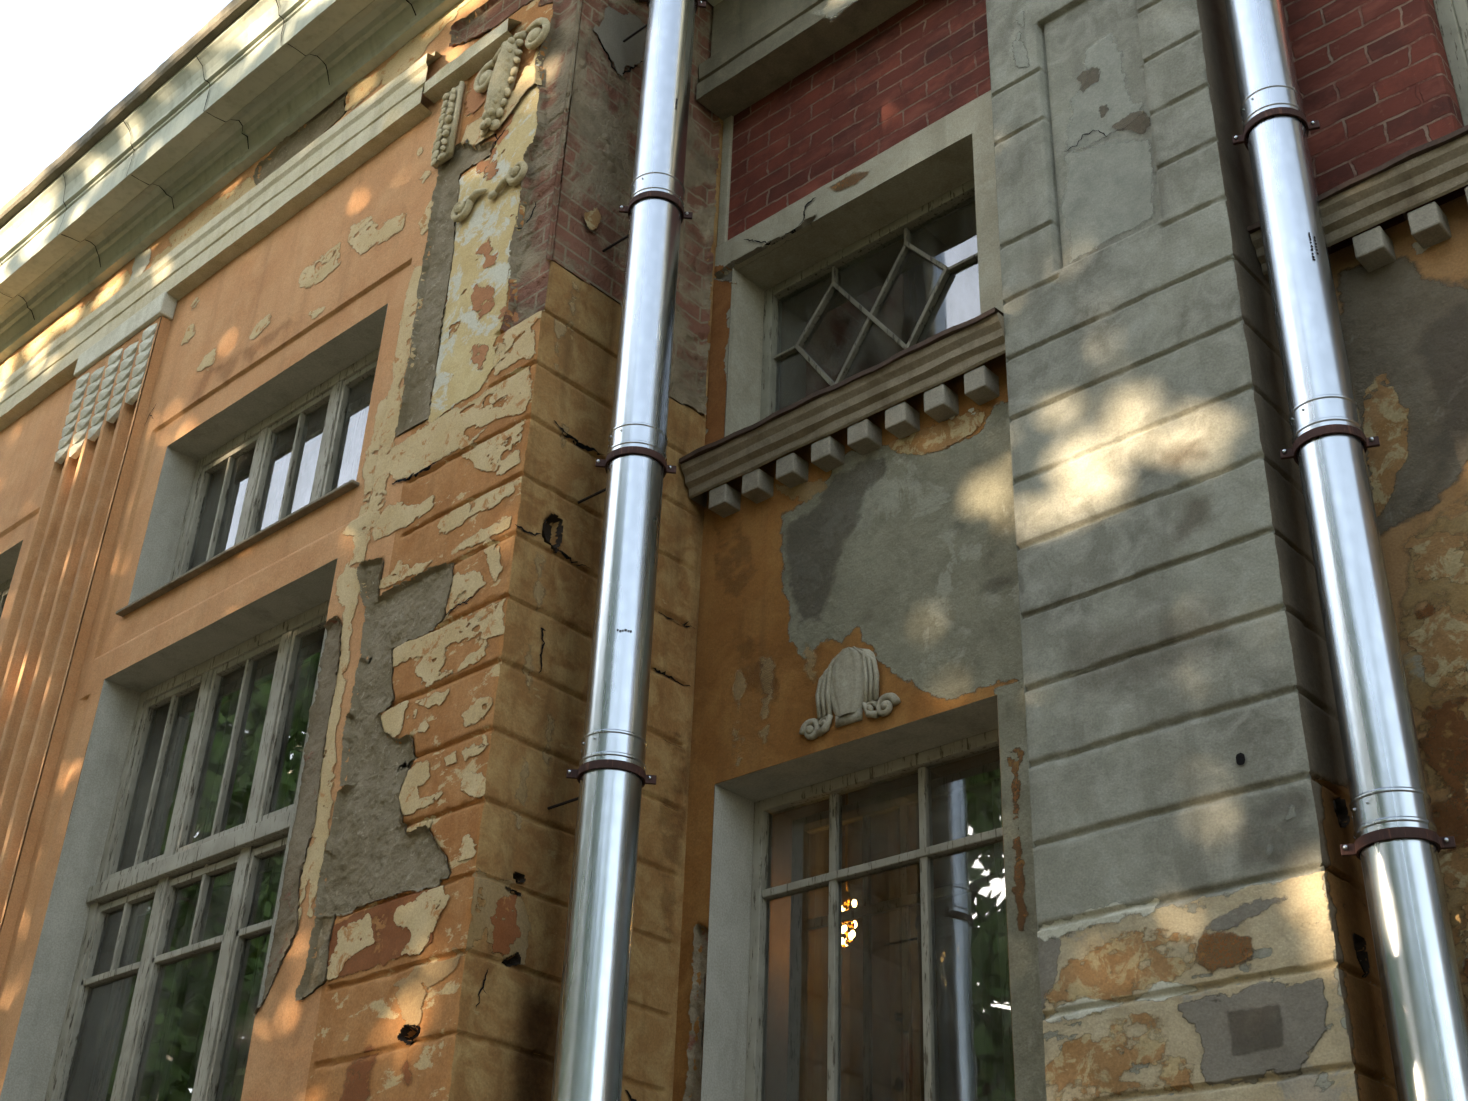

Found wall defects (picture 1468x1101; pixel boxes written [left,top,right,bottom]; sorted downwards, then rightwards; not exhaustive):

spalling [669,0,816,445]
crack [744,197,816,245]
spalling [0,0,648,1016]
crack [515,524,591,569]
peeling [889,408,985,455]
peeling [1362,373,1409,517]
peeling [1007,747,1398,1101]
peeling [1399,494,1468,1014]